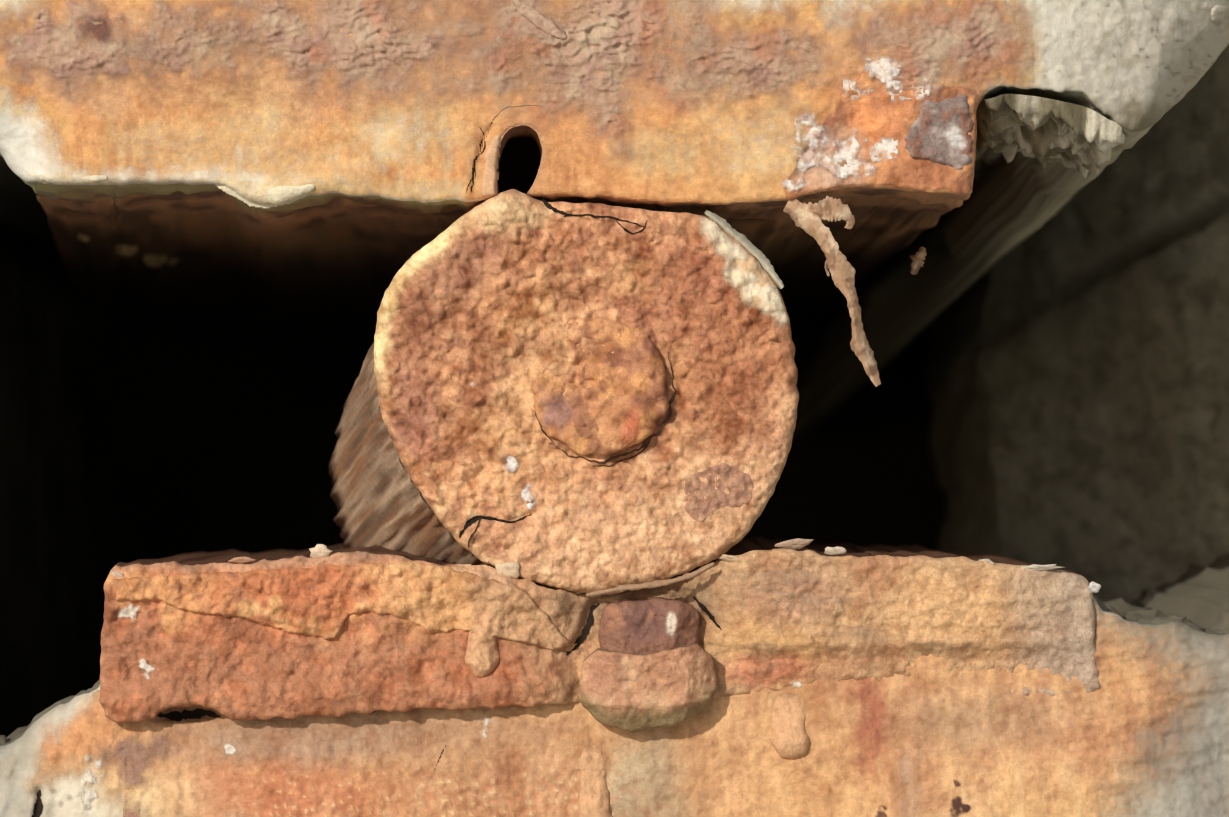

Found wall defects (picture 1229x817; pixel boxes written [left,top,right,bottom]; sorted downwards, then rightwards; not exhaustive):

rust [0,0,1034,204]
peeling [782,57,1125,387]
rust [111,544,588,686]
rust [718,554,741,562]
rust [774,538,847,555]
rust [1087,582,1101,593]
rust [32,614,1188,817]
crack [32,790,43,817]